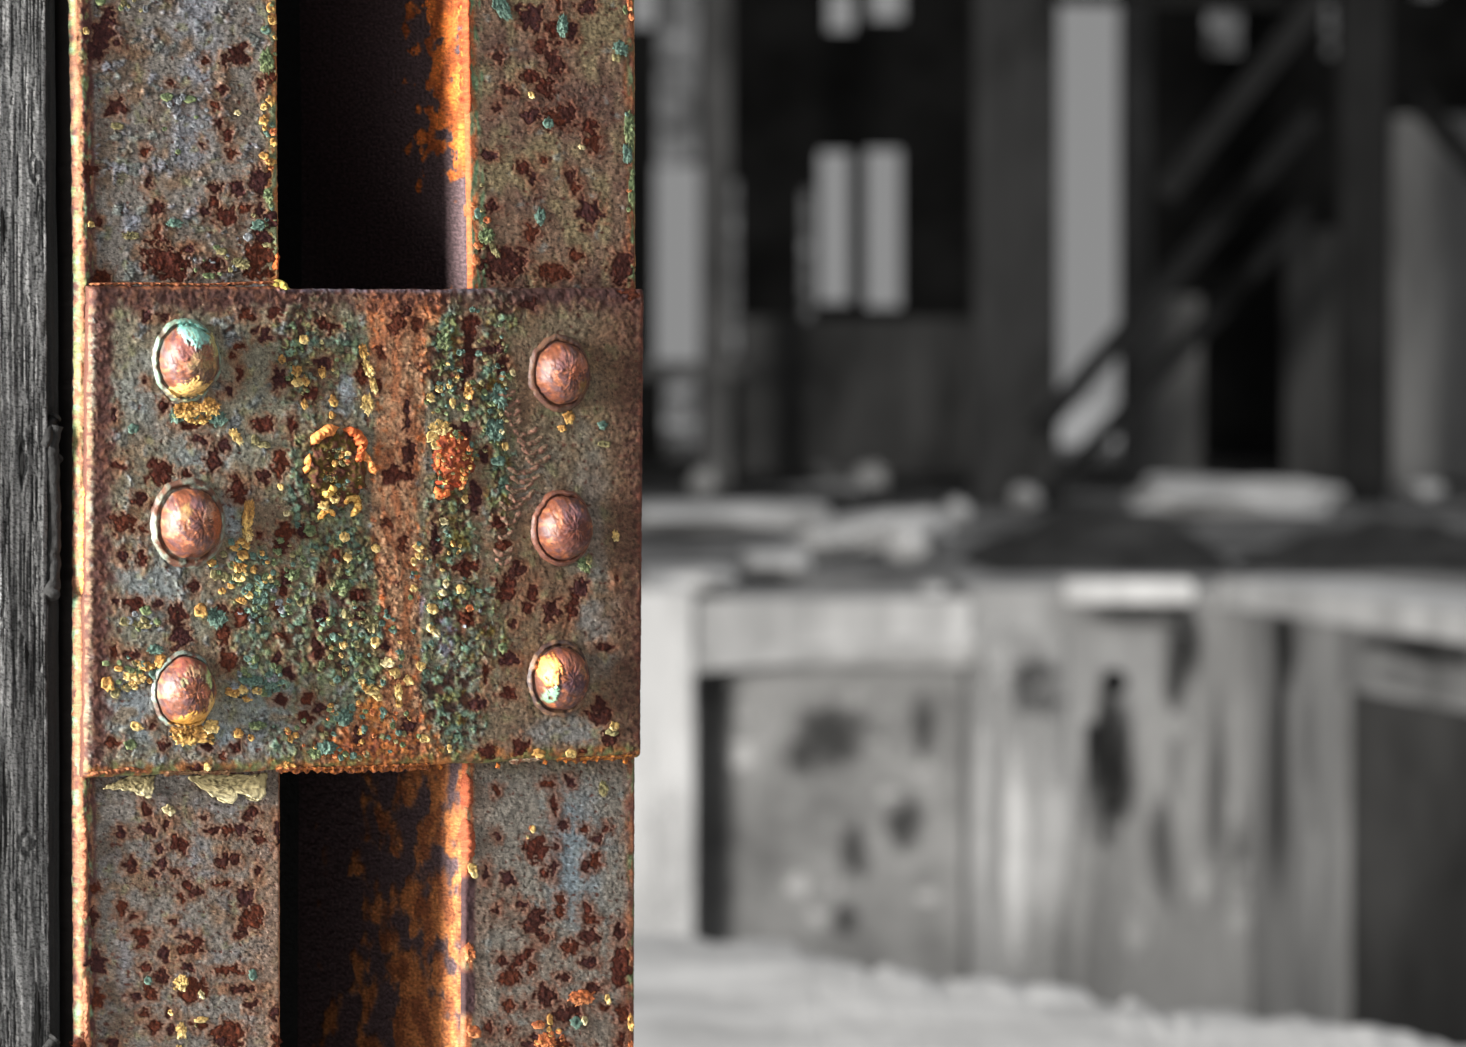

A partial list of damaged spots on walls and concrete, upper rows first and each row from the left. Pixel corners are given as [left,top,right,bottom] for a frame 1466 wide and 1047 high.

corrosion [457,0,473,115]
corrosion [516,3,602,153]
corrosion [89,167,290,290]
peeling [169,396,271,448]
peeling [277,335,340,419]
peeling [358,343,378,417]
spalling [424,323,575,565]
corrosion [109,458,173,535]
peeling [101,447,483,804]
peeling [104,775,176,816]
corrosion [178,964,255,1003]
corrosion [521,982,596,1047]